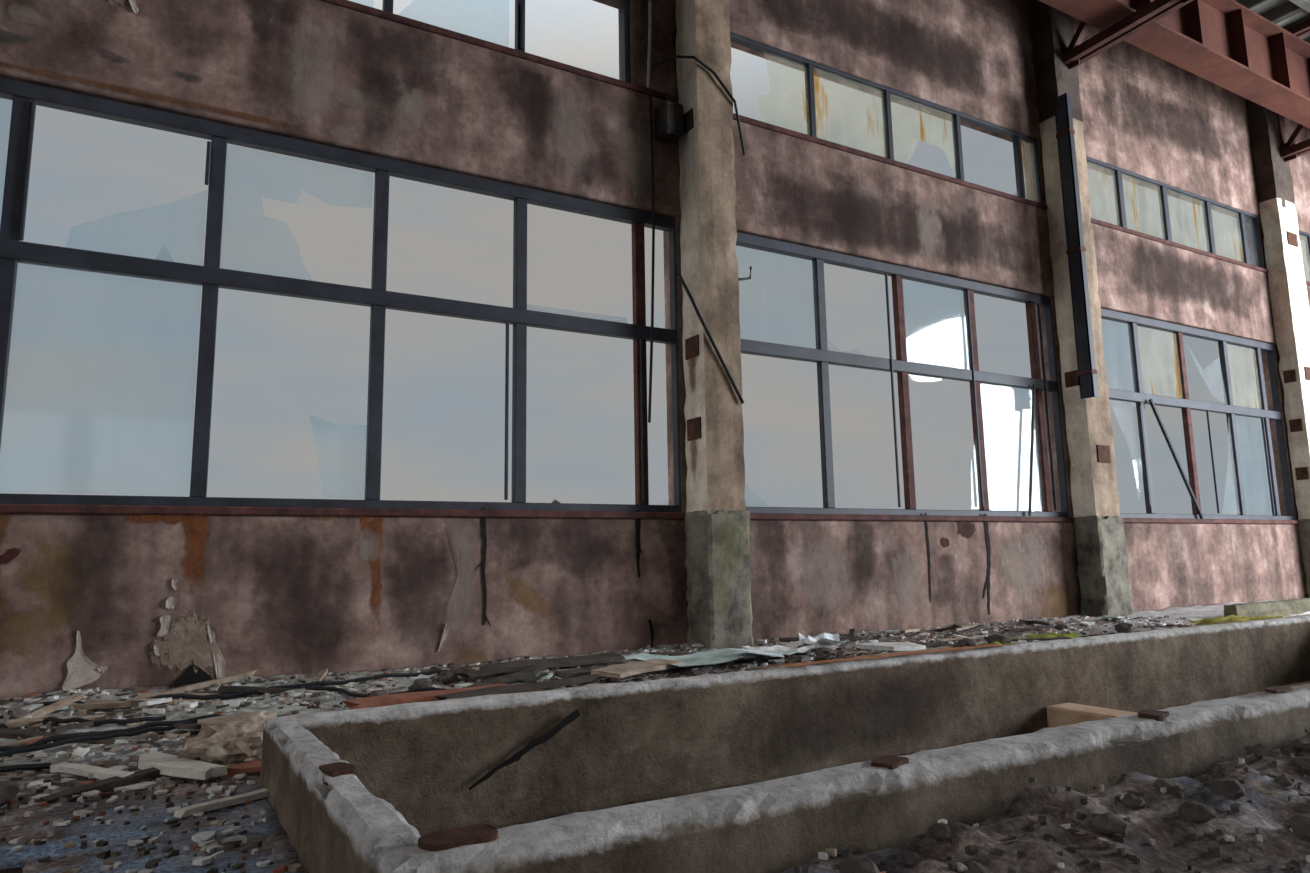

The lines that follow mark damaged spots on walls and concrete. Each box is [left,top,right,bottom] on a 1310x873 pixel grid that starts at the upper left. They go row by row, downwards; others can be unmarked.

rust [128,514,209,587]
rust [313,516,383,614]
peeling [62,631,107,691]
spalling [150,578,227,687]
crack [468,709,580,790]